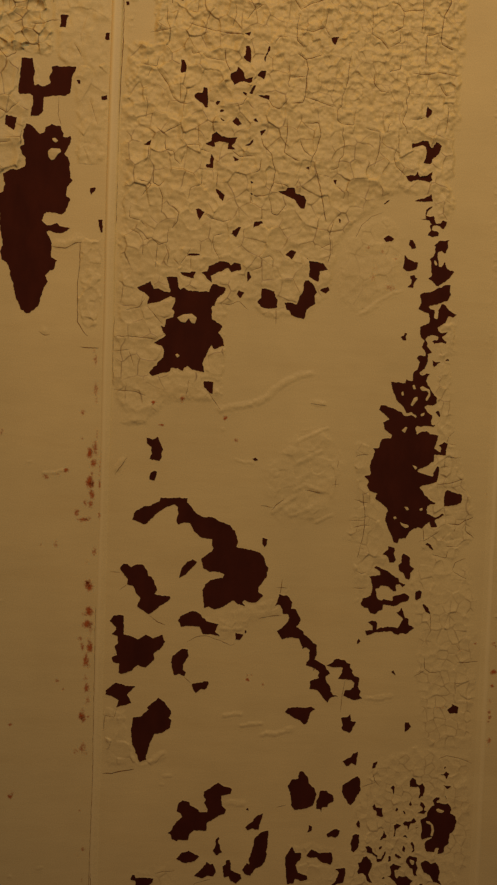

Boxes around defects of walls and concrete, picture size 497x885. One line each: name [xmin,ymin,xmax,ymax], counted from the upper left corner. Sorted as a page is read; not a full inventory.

peeling [0,0,111,316]
crack [117,22,125,112]
crack [116,97,218,267]
crack [192,3,262,69]
crack [232,0,453,261]
peeling [112,0,477,735]
peeling [103,612,211,764]
peeling [128,780,271,885]
peeling [283,750,459,885]